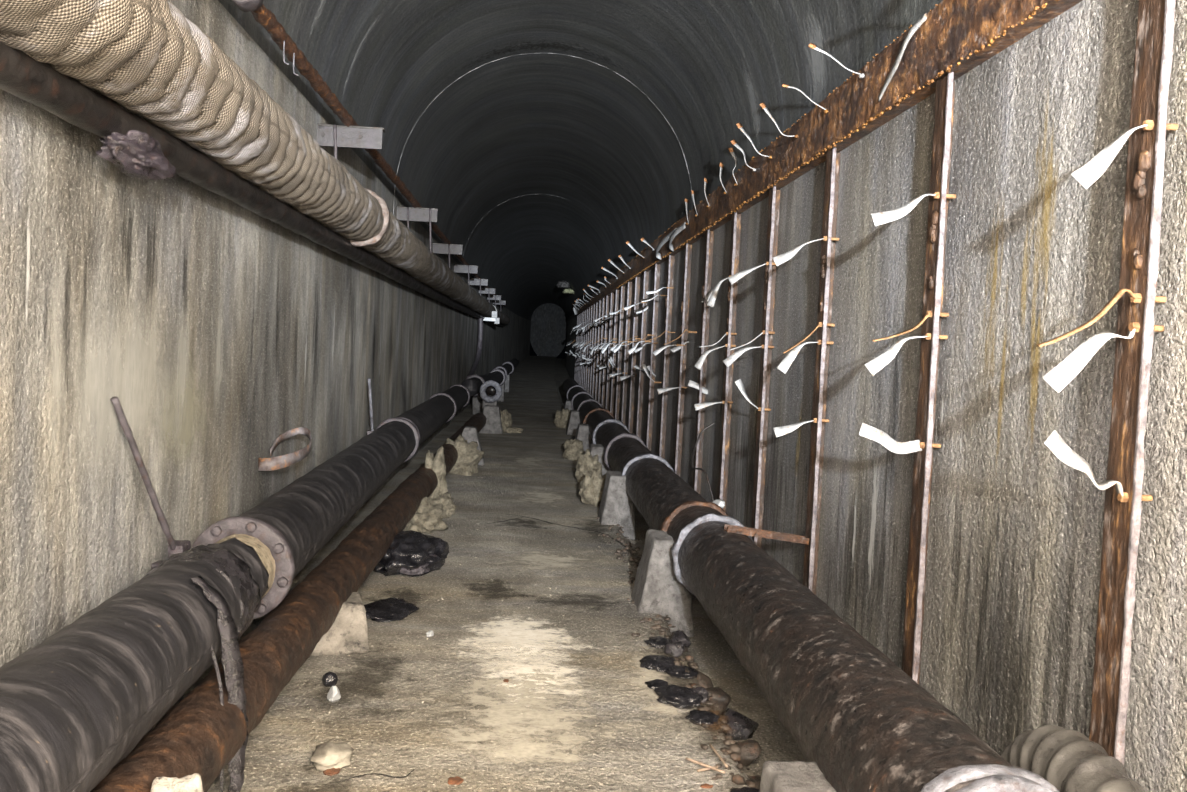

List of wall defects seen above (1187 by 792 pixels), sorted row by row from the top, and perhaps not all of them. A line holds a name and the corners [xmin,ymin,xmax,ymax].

rust [1022,144,1054,437]
water stain [316,651,411,714]